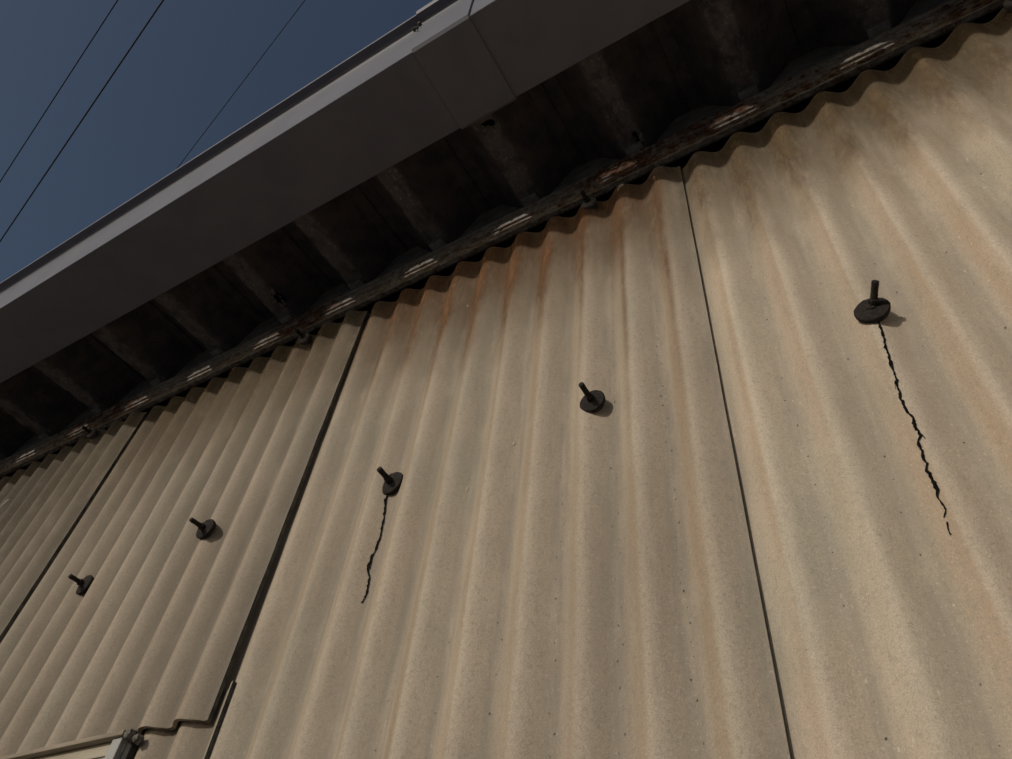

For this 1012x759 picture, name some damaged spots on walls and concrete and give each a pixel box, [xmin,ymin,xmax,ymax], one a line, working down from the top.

corrosion [390,184,636,344]
crack [878,321,951,535]
crack [361,495,388,603]